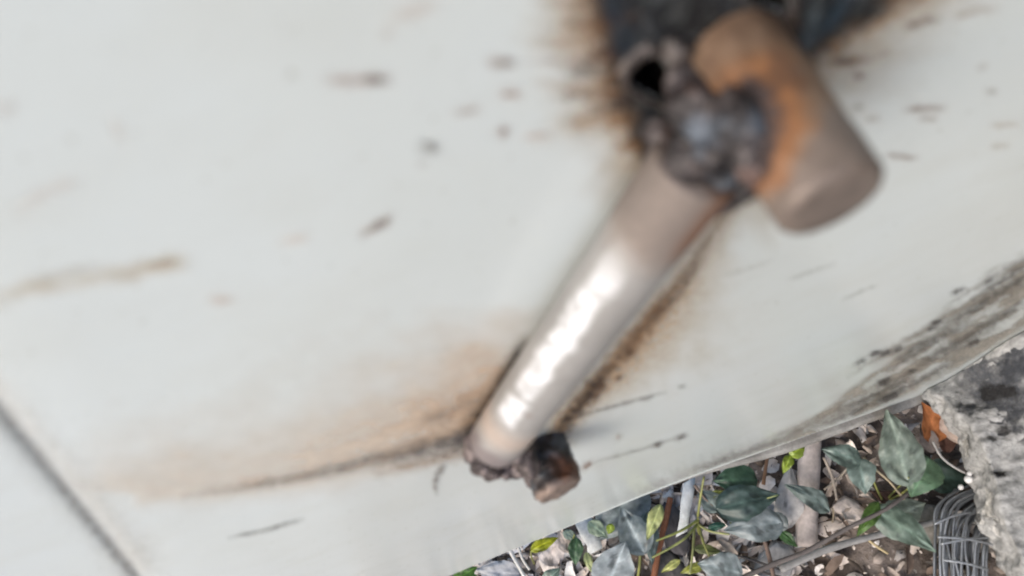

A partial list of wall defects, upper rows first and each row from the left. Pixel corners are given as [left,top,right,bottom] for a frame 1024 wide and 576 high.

leakage [956,347,1024,441]